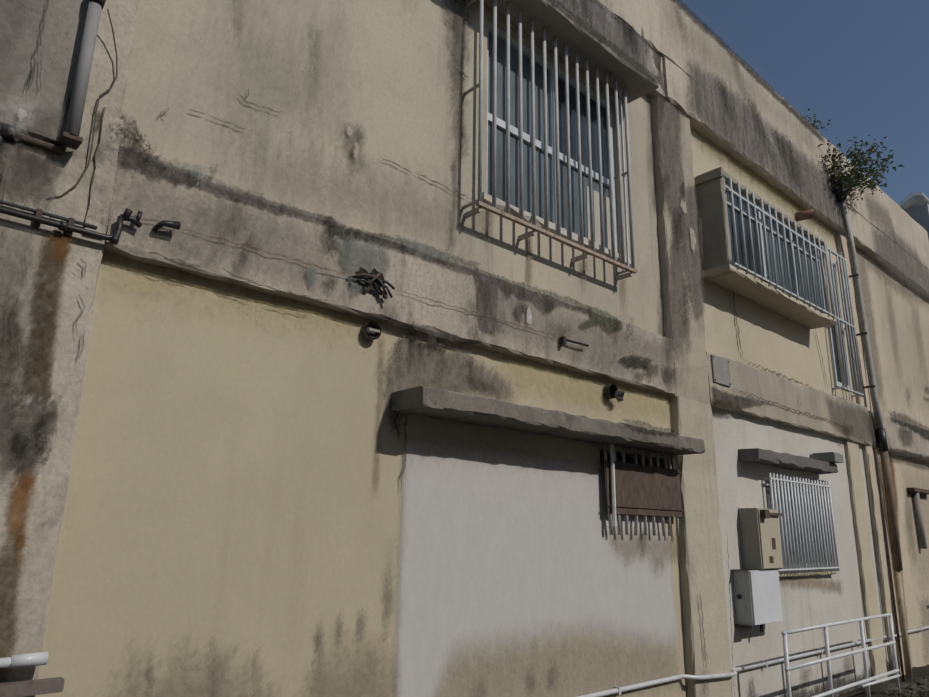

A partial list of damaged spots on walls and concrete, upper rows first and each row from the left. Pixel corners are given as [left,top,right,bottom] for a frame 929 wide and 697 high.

crack [26,0,49,99]
crack [159,108,248,130]
damp [94,110,591,332]
crack [382,158,475,201]
damp [548,0,845,358]
damp [0,231,70,485]
damp [384,325,514,430]
damp [620,355,676,382]
corrosion [8,473,35,560]
damp [0,536,24,683]
damp [781,660,874,697]